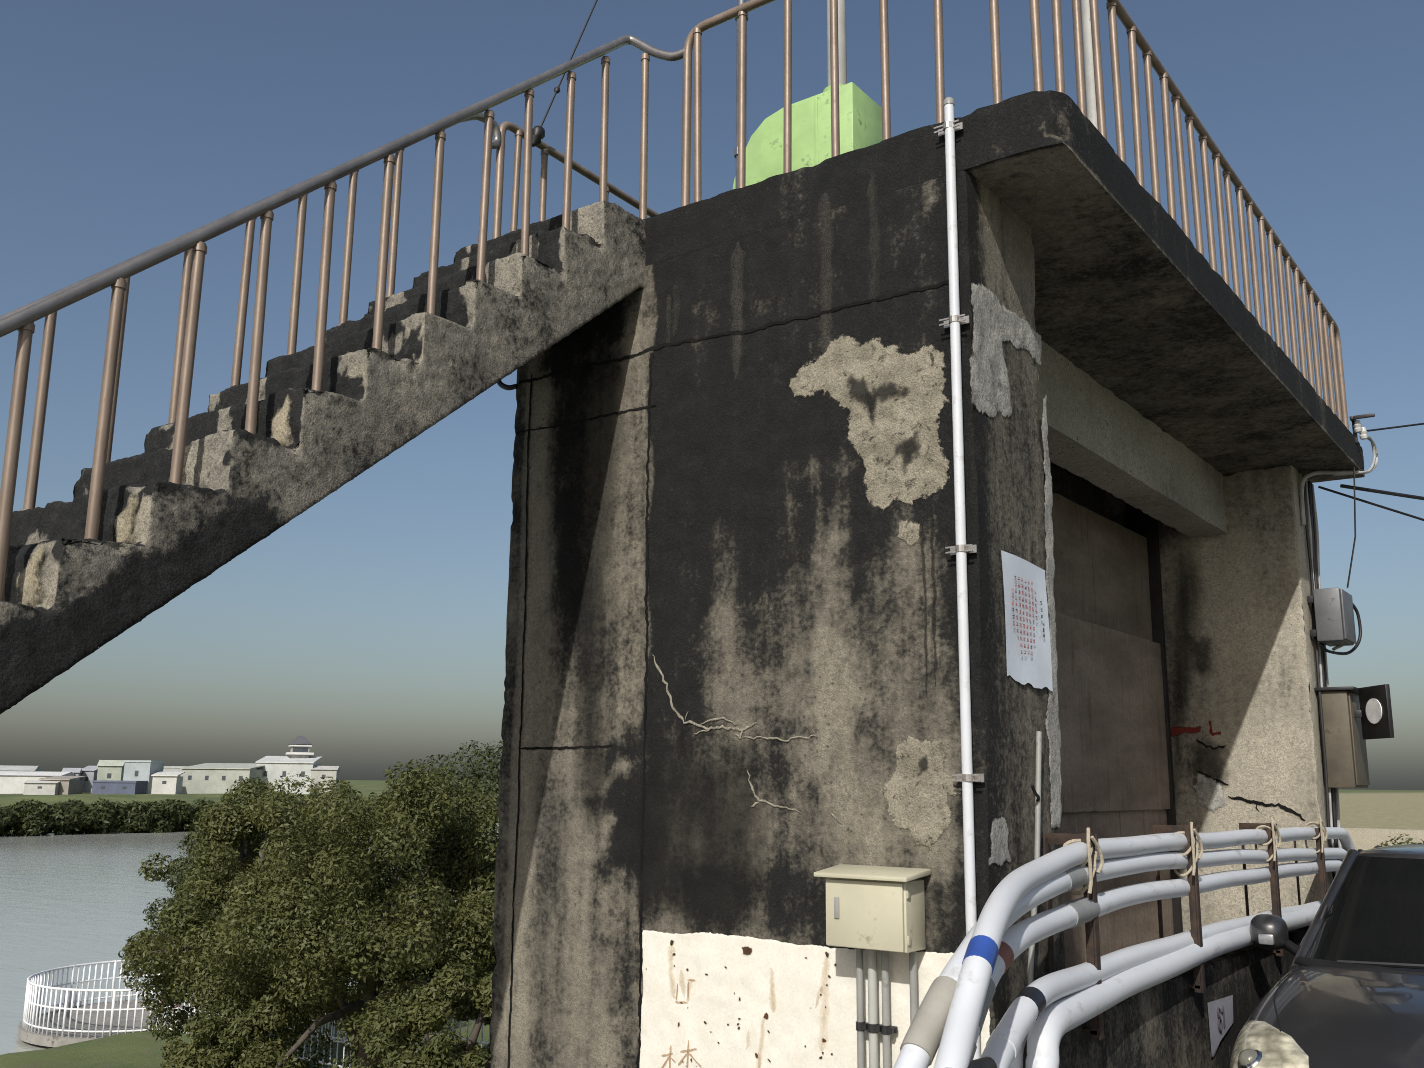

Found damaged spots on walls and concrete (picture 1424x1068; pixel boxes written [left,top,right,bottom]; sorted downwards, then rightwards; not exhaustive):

peeling [789,334,950,546]
peeling [969,283,1042,417]
water stain [565,337,617,786]
crack [507,280,949,1068]
water stain [921,495,936,699]
water stain [638,755,753,917]
peeling [883,736,961,850]
crack [1228,796,1305,821]